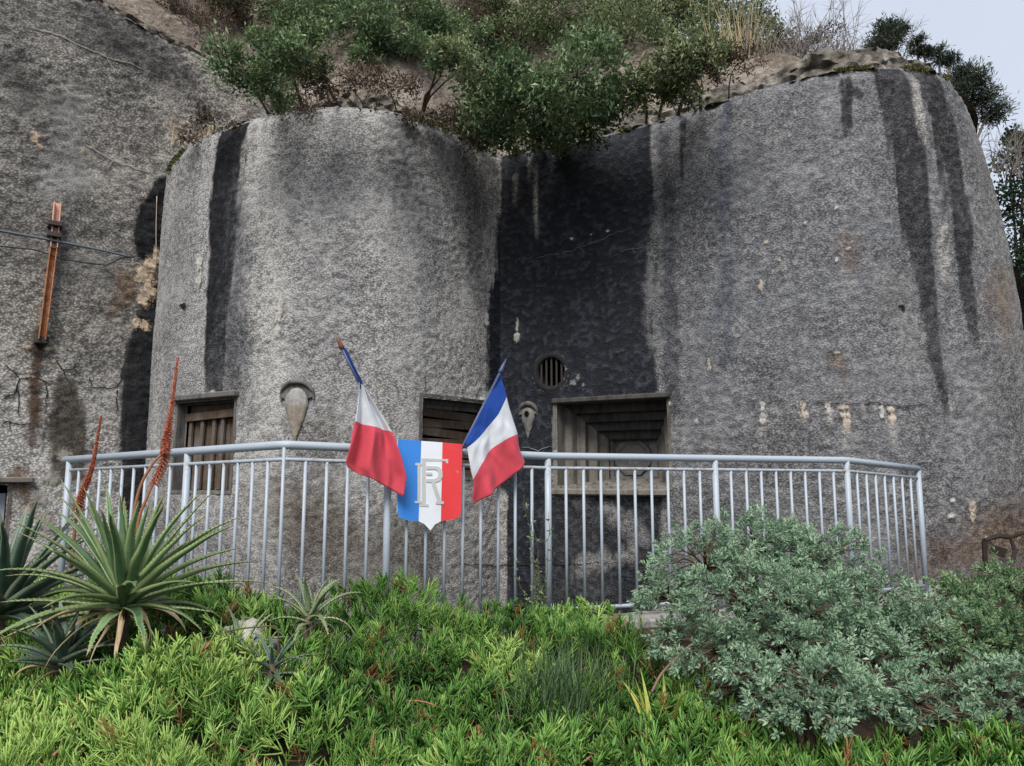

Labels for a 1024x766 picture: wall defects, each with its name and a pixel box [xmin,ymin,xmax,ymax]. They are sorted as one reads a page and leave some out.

damp [204,122,254,392]
damp [874,69,978,407]
rust [27,326,42,445]
crack [1,355,126,432]
damp [120,175,167,527]
damp [486,118,686,619]
spalling [759,402,768,431]
spalling [824,403,865,436]
spalling [879,405,897,428]